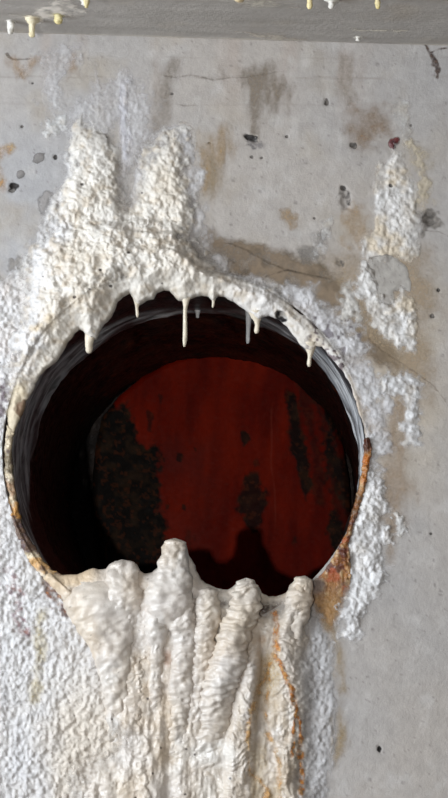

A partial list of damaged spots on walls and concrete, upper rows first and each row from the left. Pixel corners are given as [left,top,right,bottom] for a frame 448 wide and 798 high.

water stain [0,68,364,798]
rust [246,611,304,795]
water stain [202,149,432,640]
rust [313,437,372,629]